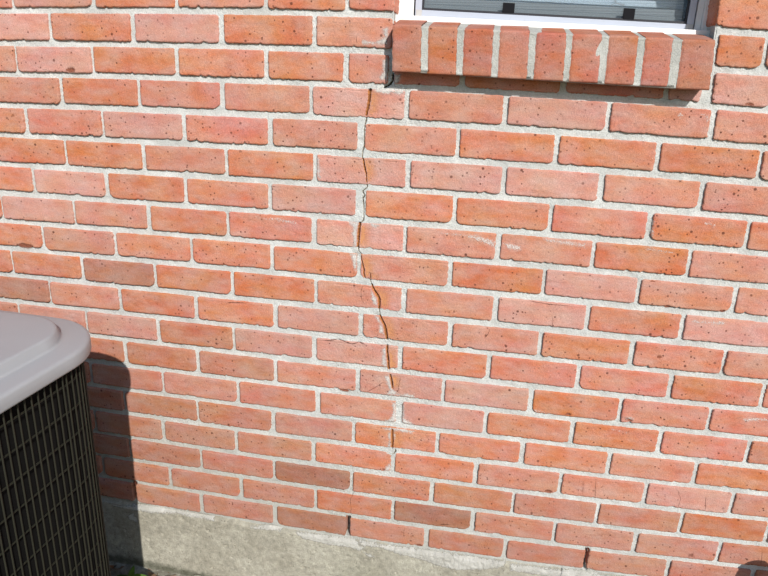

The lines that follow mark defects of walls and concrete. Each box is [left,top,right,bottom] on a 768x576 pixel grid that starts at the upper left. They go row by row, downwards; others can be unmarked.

crack [357,90,401,391]
crack [390,429,398,454]